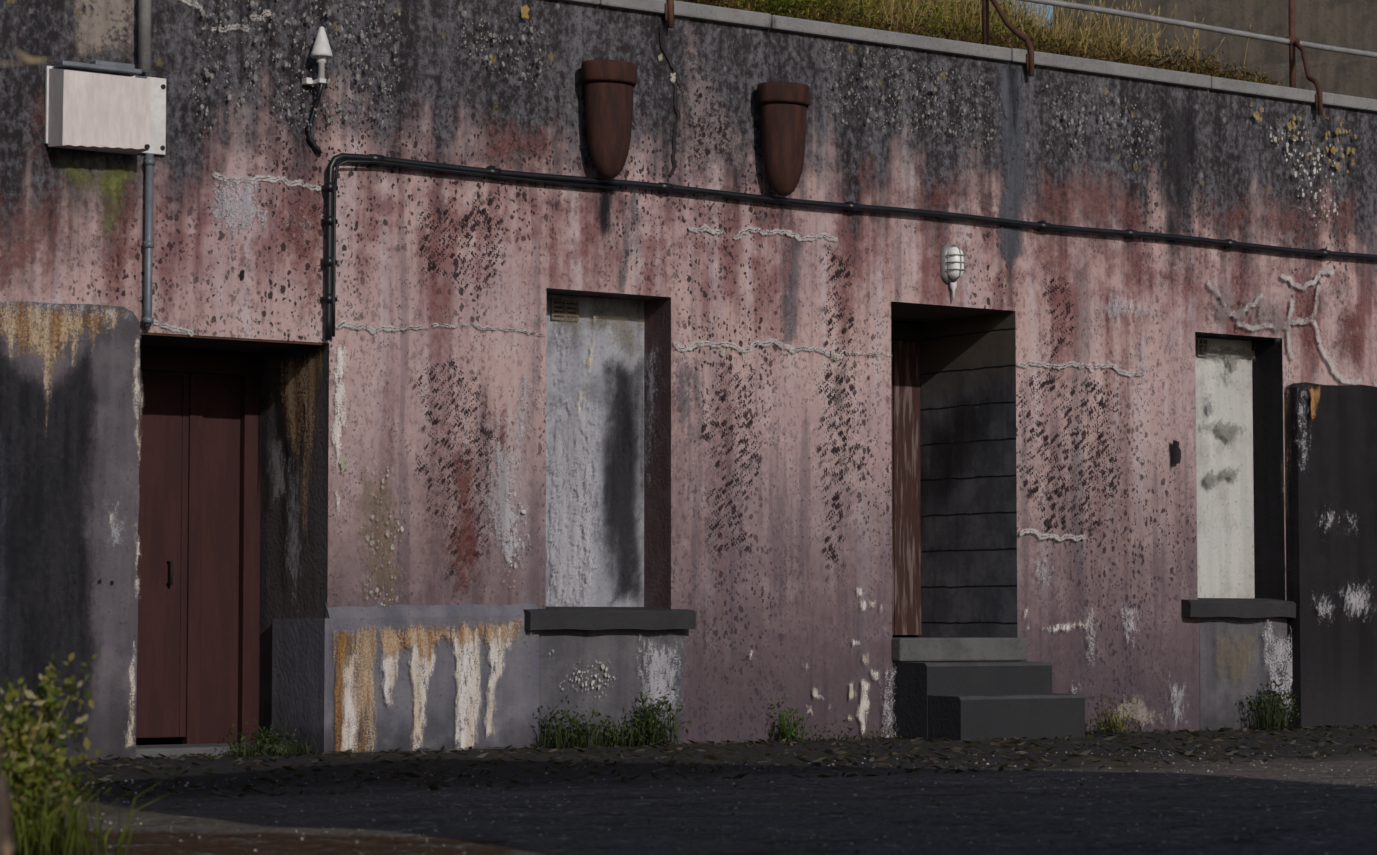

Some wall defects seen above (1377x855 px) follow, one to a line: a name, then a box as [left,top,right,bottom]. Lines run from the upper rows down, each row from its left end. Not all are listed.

leakage [996,67,1026,282]
corrosion [0,293,133,395]
leakage [132,339,143,469]
leakage [546,319,663,607]
crack [1208,268,1362,385]
leakage [0,350,140,748]
corrosion [333,619,532,753]
peeling [848,640,879,734]